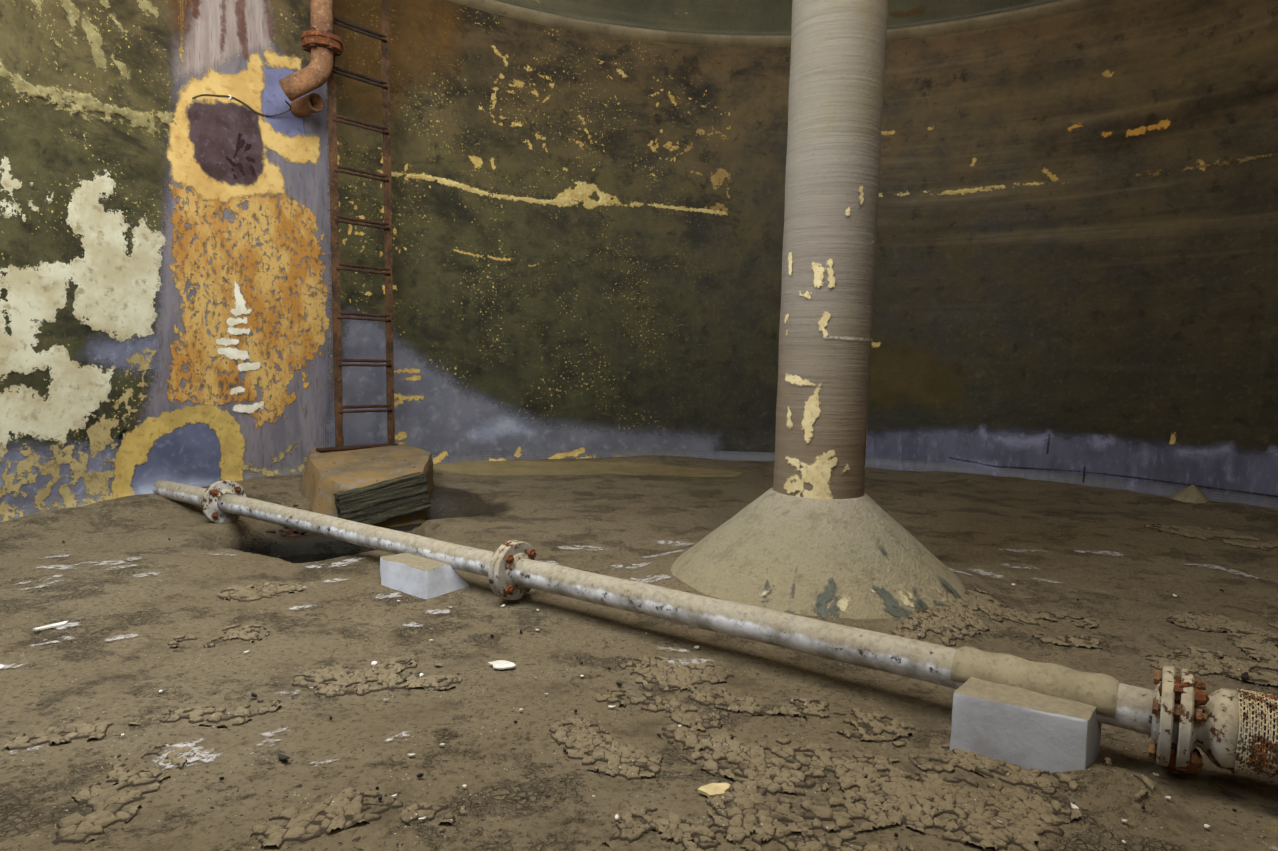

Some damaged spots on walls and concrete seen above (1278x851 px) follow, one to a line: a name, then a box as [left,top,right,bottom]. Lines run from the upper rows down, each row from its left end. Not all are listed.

flaking render [262,67,306,137]
peeling [0,152,54,222]
rust [111,0,332,499]
leakage [139,0,333,480]
peeling [0,169,167,519]
flaking render [131,423,221,495]
flaking render [323,310,717,464]
peeling [785,373,822,443]
peeling [784,450,849,499]
leakage [980,428,1051,448]
flaking render [864,428,1278,509]
leakage [1088,436,1114,450]